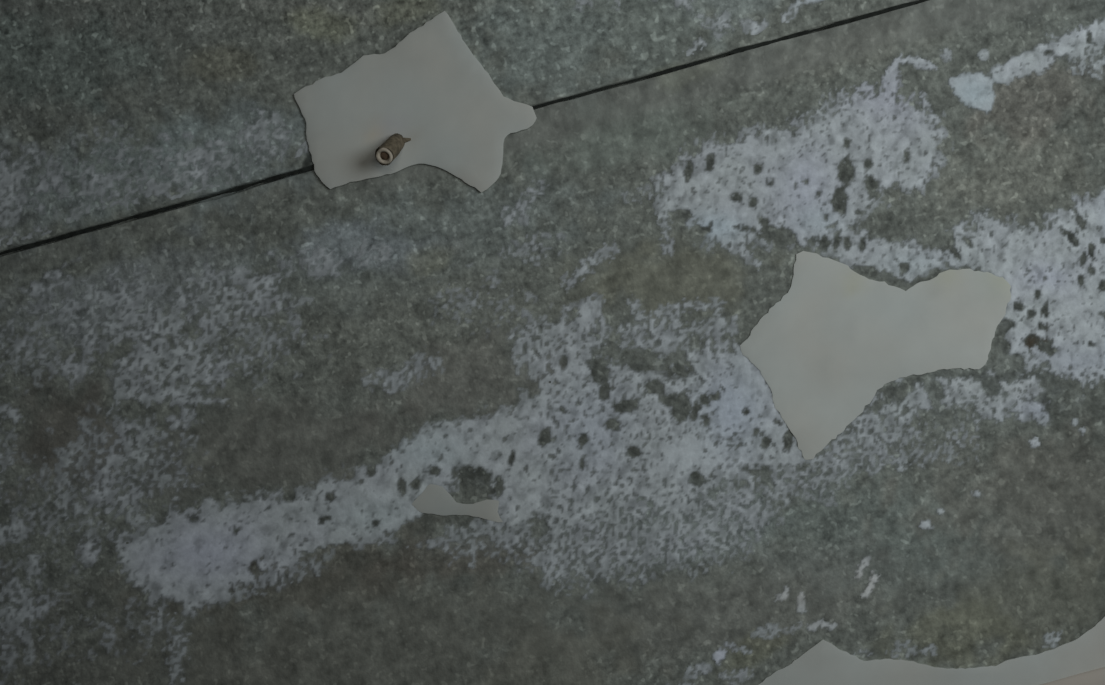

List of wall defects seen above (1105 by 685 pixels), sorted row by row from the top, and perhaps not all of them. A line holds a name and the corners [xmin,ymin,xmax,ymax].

flaking render [294,11,537,193]
damp [675,0,768,56]
crack [532,0,928,109]
damp [782,0,822,23]
damp [949,18,1105,113]
crack [0,155,314,255]
damp [560,243,619,289]
damp [637,54,1105,430]
flaking render [740,251,1011,460]
flaking render [412,484,503,522]
damp [0,260,978,685]
peeling [758,616,1105,685]